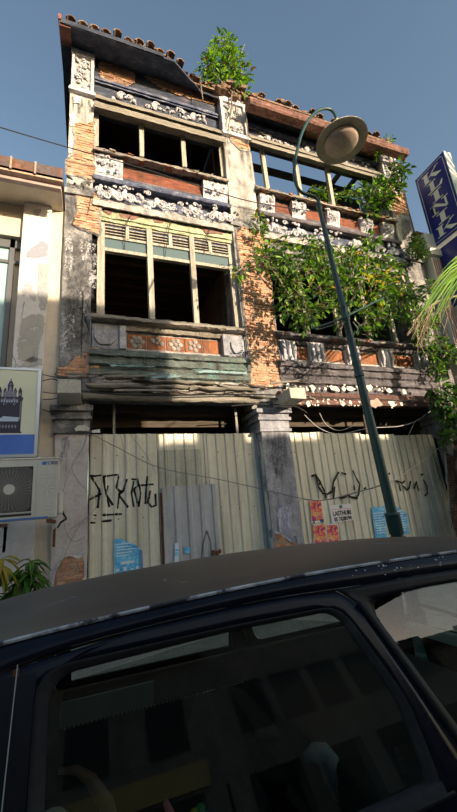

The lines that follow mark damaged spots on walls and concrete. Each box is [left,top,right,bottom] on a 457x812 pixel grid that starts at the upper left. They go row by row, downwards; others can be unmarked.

flaking render [98,60,218,106]
flaking render [65,96,97,182]
flaking render [72,193,141,237]
peeling [17,241,49,367]
water stain [59,234,97,358]
flaking render [193,227,414,408]
flaking render [54,346,102,379]
peeling [110,364,182,389]
flaking render [260,460,299,548]
flaking render [50,553,87,587]